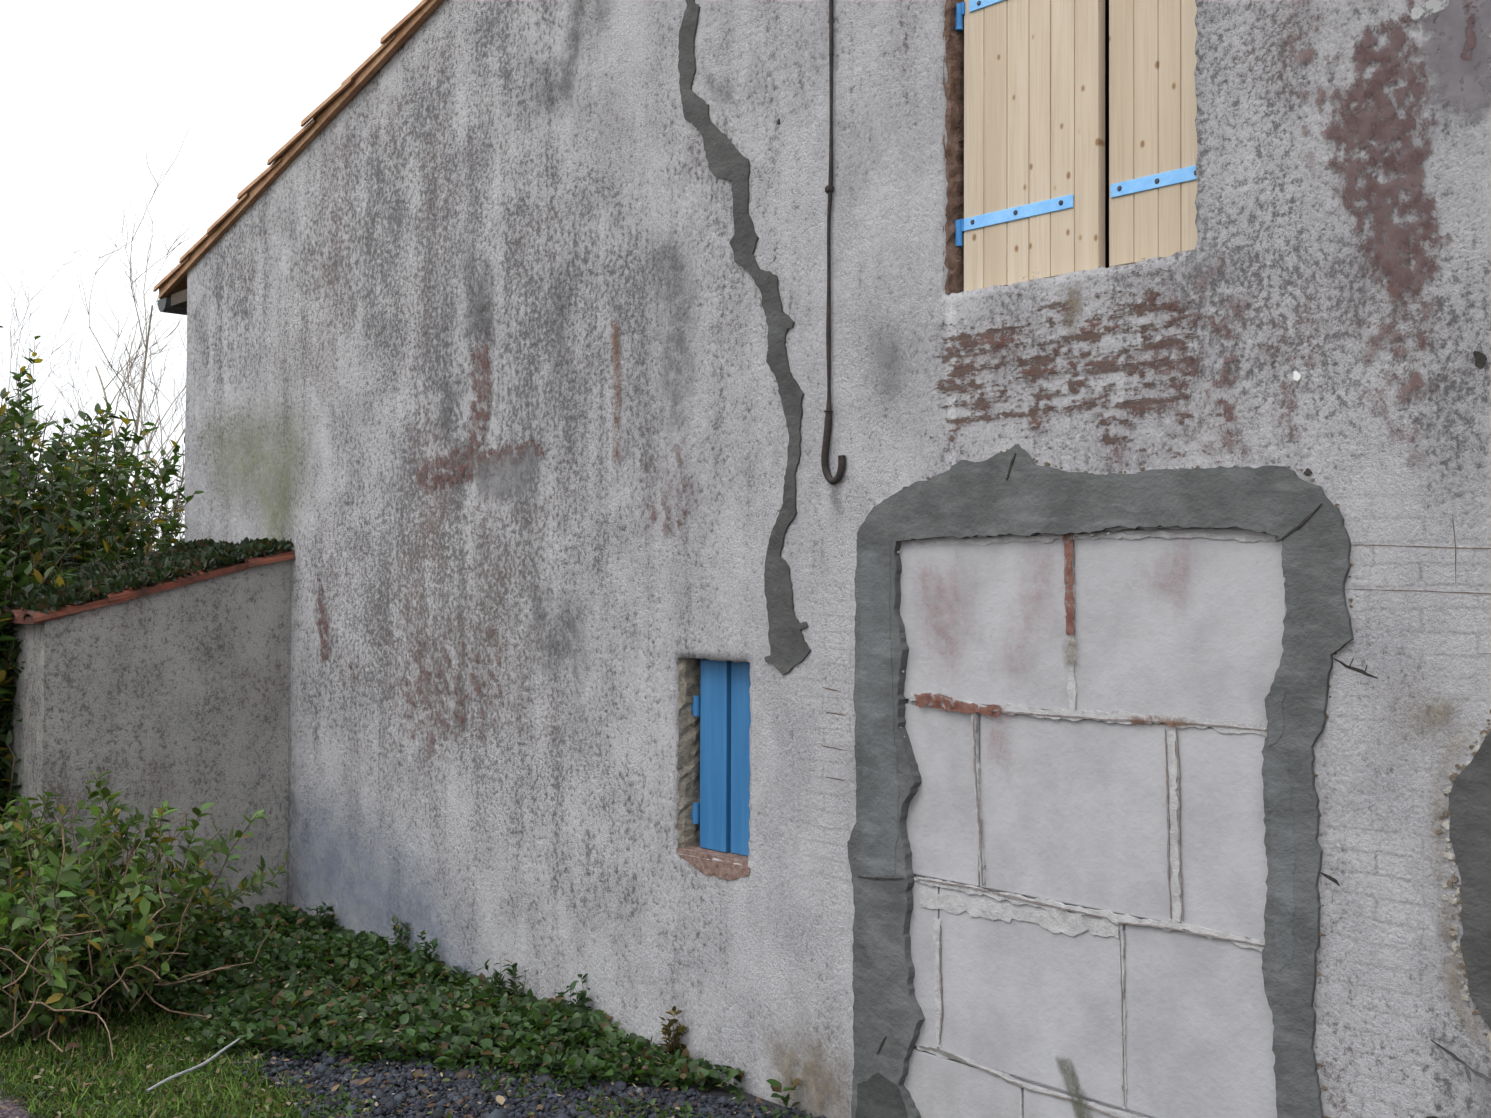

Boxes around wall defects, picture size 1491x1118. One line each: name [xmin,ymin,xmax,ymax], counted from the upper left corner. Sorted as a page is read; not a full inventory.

crack [678,0,847,781]
peeling [929,258,1244,474]
peeling [1277,320,1309,429]
peeling [1290,0,1491,440]